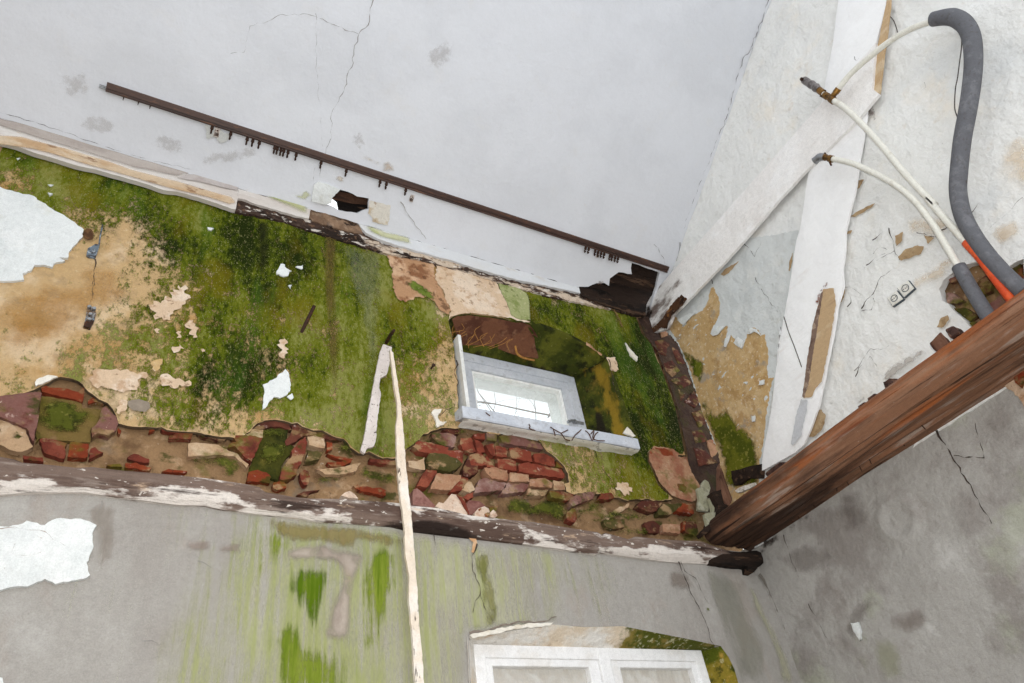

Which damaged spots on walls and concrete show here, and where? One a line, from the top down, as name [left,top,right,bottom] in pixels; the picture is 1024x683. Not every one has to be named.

crack [249,0,374,179]
peeling [0,184,84,283]
spalling [309,182,363,235]
spalling [368,201,391,225]
flaking render [937,277,979,328]
flaking render [977,275,1006,310]
flaking render [1012,264,1024,279]
spalling [0,230,798,538]
crack [935,424,992,523]
peeling [0,518,97,592]
water stain [290,546,360,637]
crack [678,562,715,647]